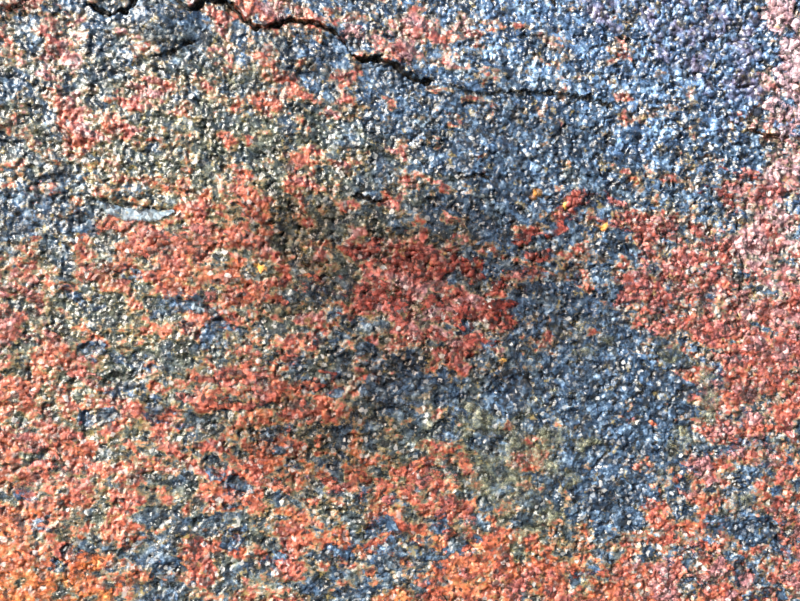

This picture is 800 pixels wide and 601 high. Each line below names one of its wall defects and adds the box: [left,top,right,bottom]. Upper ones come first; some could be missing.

crack [88,0,136,17]
crack [166,41,195,55]
crack [176,0,434,85]
crack [459,89,553,97]